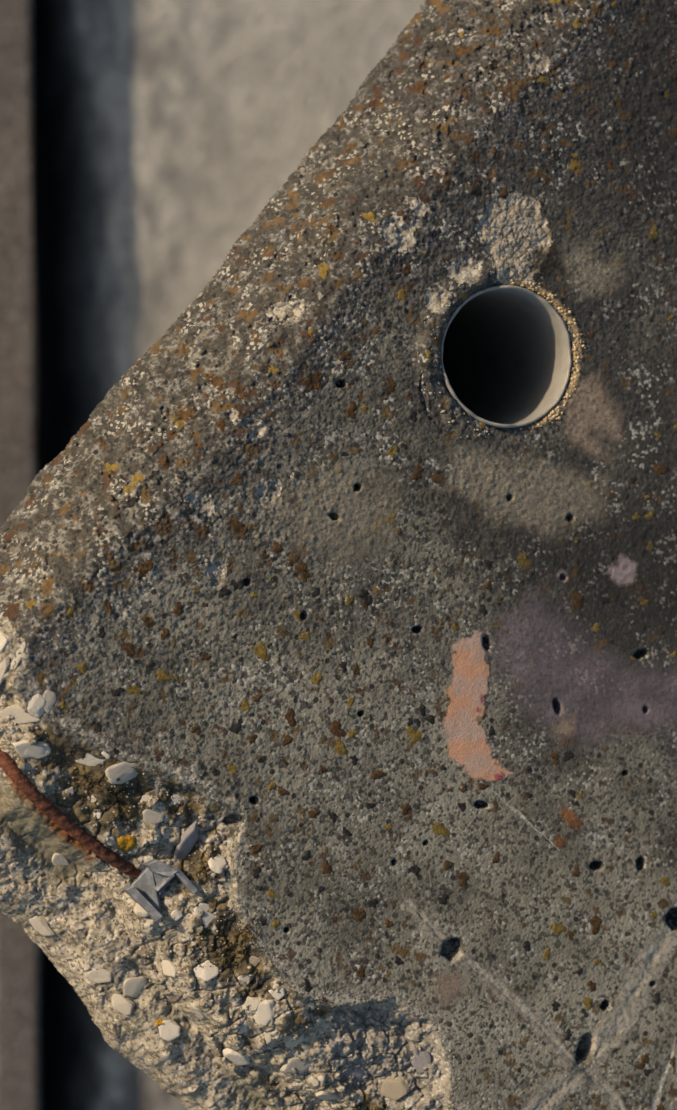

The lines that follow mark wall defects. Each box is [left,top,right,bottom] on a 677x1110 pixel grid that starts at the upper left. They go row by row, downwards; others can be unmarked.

spalling [0,618,469,1110]
peeling [443,631,515,781]